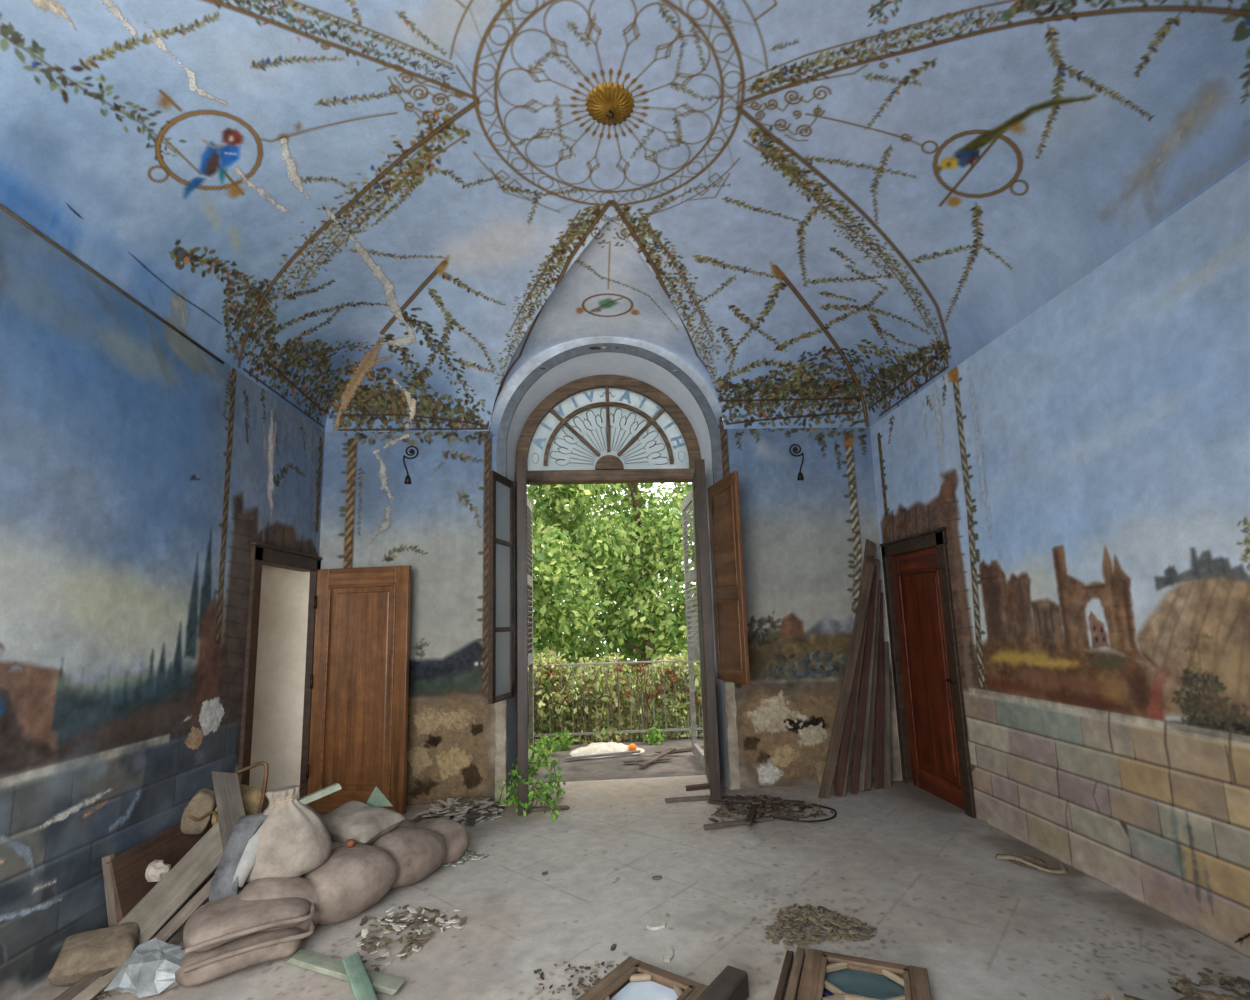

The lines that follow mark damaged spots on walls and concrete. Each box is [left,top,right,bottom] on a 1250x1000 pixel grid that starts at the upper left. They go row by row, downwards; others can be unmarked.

peeling [32,0,76,30]
peeling [333,337,393,431]
flaking render [184,697,225,749]
flaking render [406,694,491,806]
flaking render [737,690,839,785]